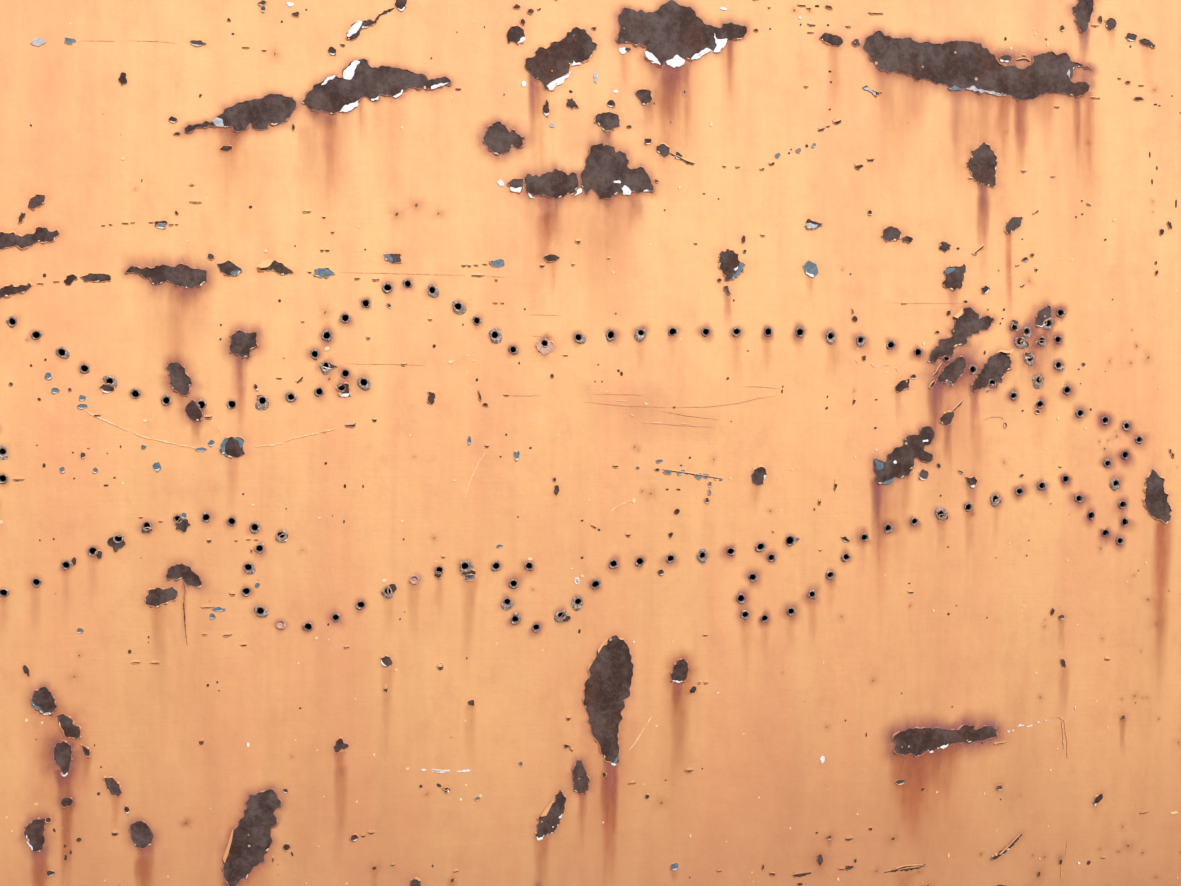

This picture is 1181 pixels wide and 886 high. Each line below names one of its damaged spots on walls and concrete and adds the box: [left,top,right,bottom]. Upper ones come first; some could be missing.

peeling [615,0,771,69]
peeling [797,4,1100,109]
peeling [168,58,462,152]
peeling [928,241,1052,393]
peeling [873,410,954,485]
peeling [1142,469,1172,525]
peeling [534,635,634,841]
peeling [892,724,1006,757]
peeling [221,788,293,886]